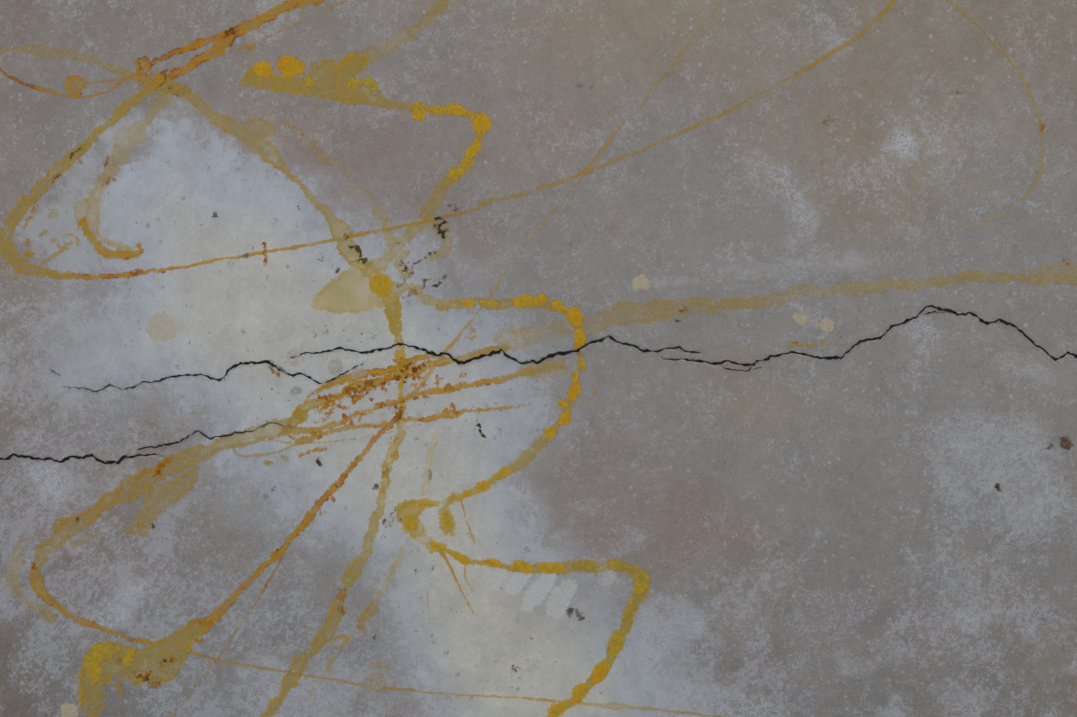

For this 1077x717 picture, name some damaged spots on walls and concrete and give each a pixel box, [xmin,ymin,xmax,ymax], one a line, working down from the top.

crack [49,305,1077,394]
crack [0,422,291,465]